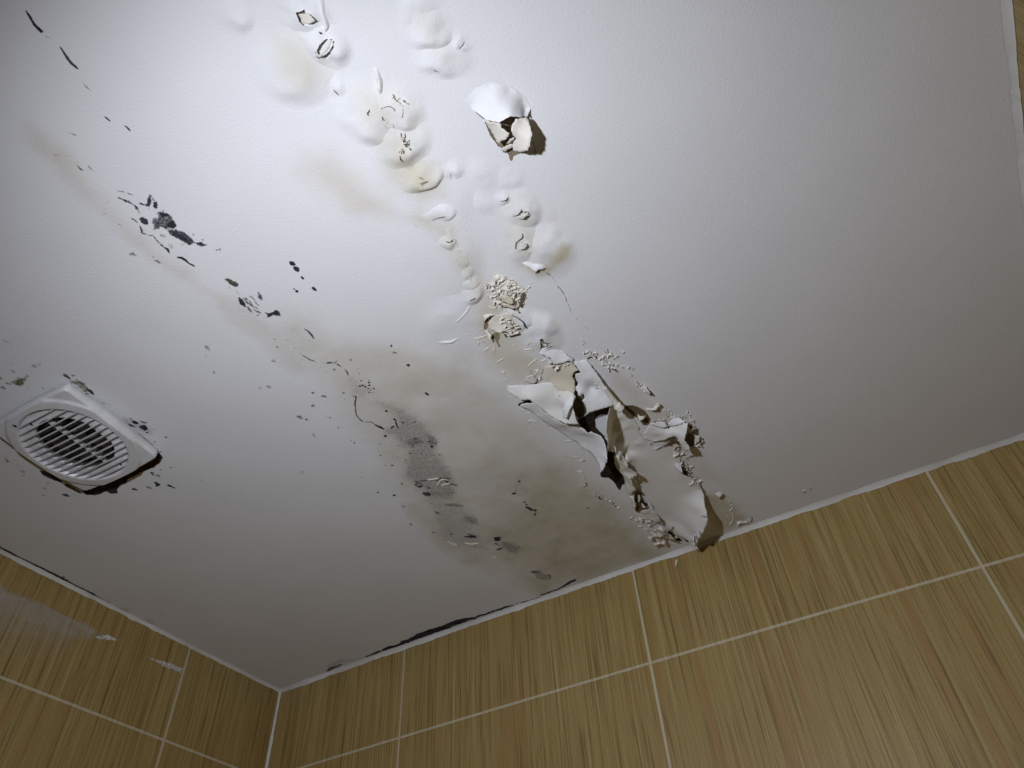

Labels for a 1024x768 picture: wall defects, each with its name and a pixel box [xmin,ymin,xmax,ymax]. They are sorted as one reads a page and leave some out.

peeling [467,274,708,548]
damp [473,579,576,619]